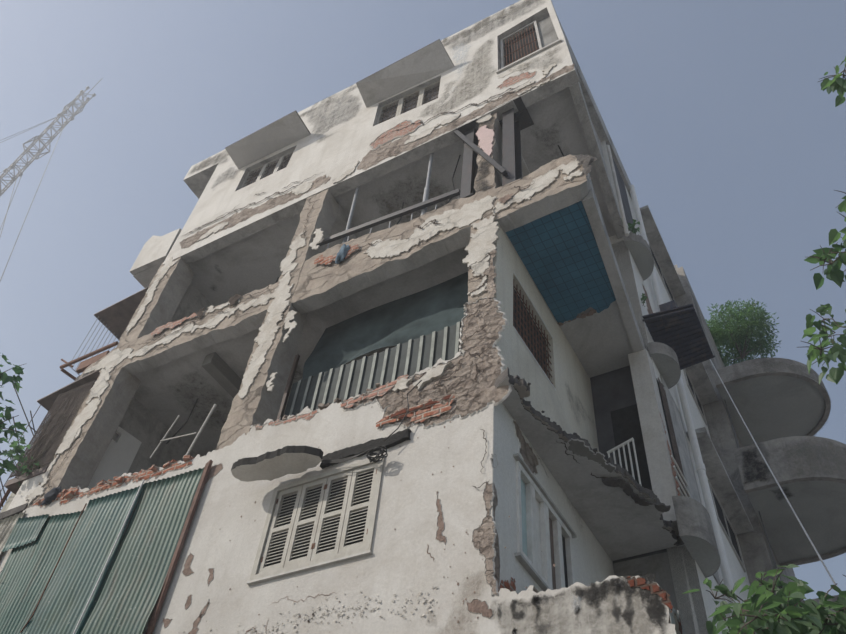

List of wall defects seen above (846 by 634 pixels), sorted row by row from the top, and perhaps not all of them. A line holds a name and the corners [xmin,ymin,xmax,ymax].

peeling [180,63,575,249]
spalling [25,154,656,506]
spalling [462,429,527,619]
spalling [182,552,194,577]
crack [245,592,335,634]
peeling [237,586,437,634]
water stain [495,573,665,634]